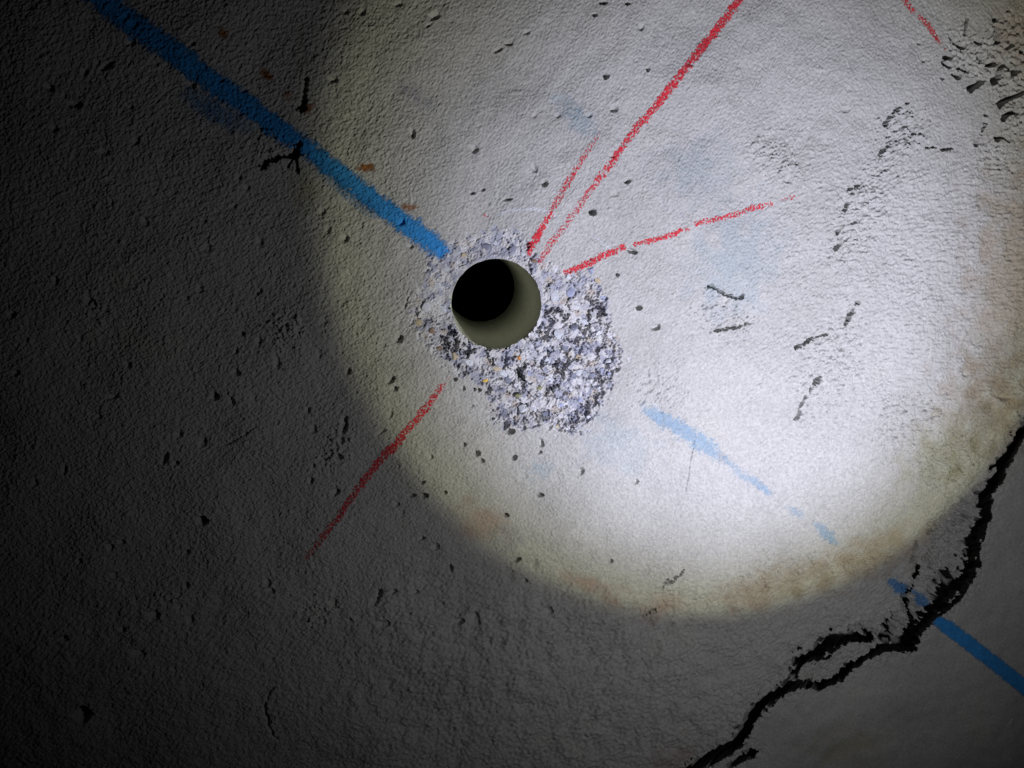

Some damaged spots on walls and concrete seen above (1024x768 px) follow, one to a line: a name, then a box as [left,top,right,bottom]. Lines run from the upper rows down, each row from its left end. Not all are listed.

crack [257,141,304,174]
spalling [406,224,697,439]
crack [684,417,1024,768]